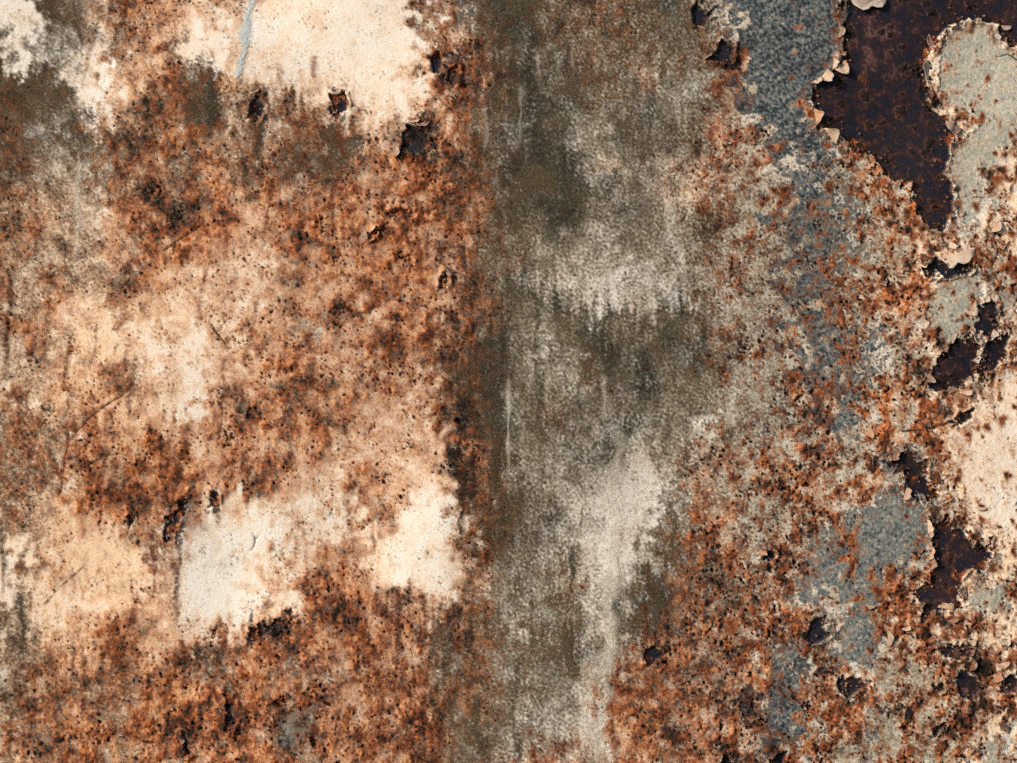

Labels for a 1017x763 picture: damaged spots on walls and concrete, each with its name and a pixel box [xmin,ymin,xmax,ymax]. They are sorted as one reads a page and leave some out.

peeling [692,1,717,30]
peeling [394,119,439,161]
peeling [810,0,1017,233]
corrosion [0,0,501,763]
leakage [408,0,738,763]
corrosion [592,0,1017,763]
peeling [949,405,974,425]
peeling [925,298,1010,395]
peeling [909,514,993,622]
corrosion [516,736,577,763]
peeling [765,751,788,763]